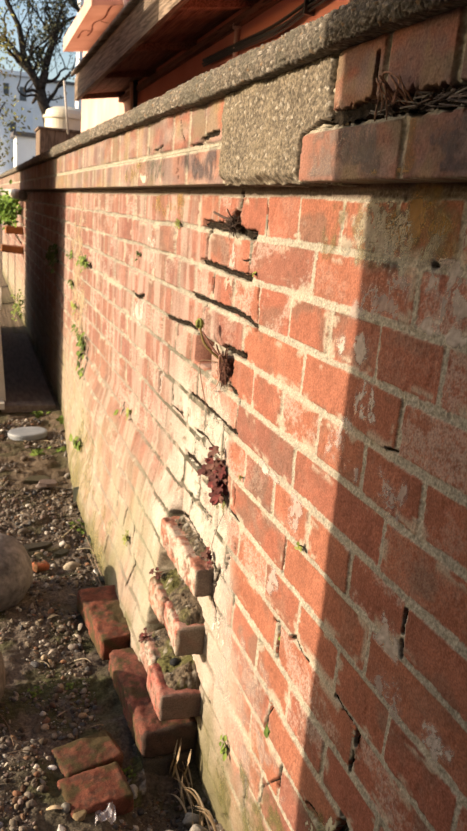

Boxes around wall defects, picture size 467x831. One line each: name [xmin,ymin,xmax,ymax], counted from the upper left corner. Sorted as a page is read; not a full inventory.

crack [168,259,260,330]
crack [207,221,258,239]
leakage [331,203,417,317]
leakage [420,197,467,348]
crack [228,346,248,358]
leakage [338,334,366,364]
leakage [355,382,375,423]
leakage [326,419,352,451]
spalling [175,516,209,562]
spalling [160,568,224,646]
spalling [152,628,200,690]
leakage [240,765,282,831]